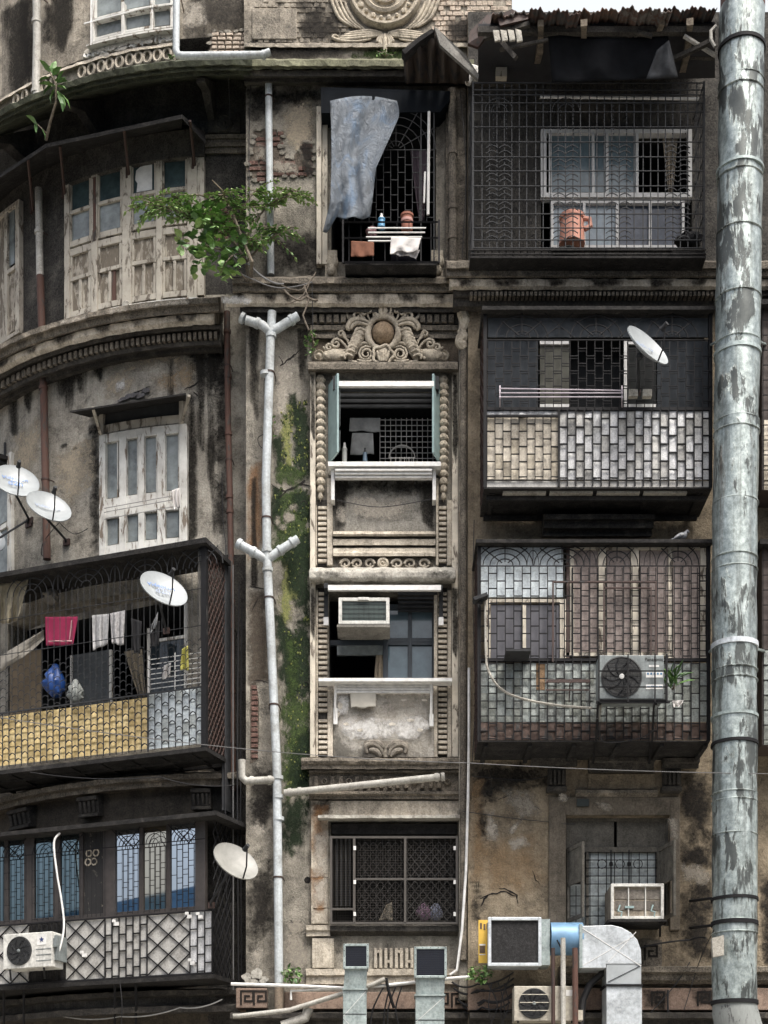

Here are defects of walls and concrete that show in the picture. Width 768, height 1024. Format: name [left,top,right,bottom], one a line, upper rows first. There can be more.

water stain [1,0,73,92]
flaking render [244,102,317,204]
water stain [187,344,226,540]
water stain [249,326,259,416]
water stain [272,329,315,487]
crack [480,870,540,906]
water stain [680,774,713,960]